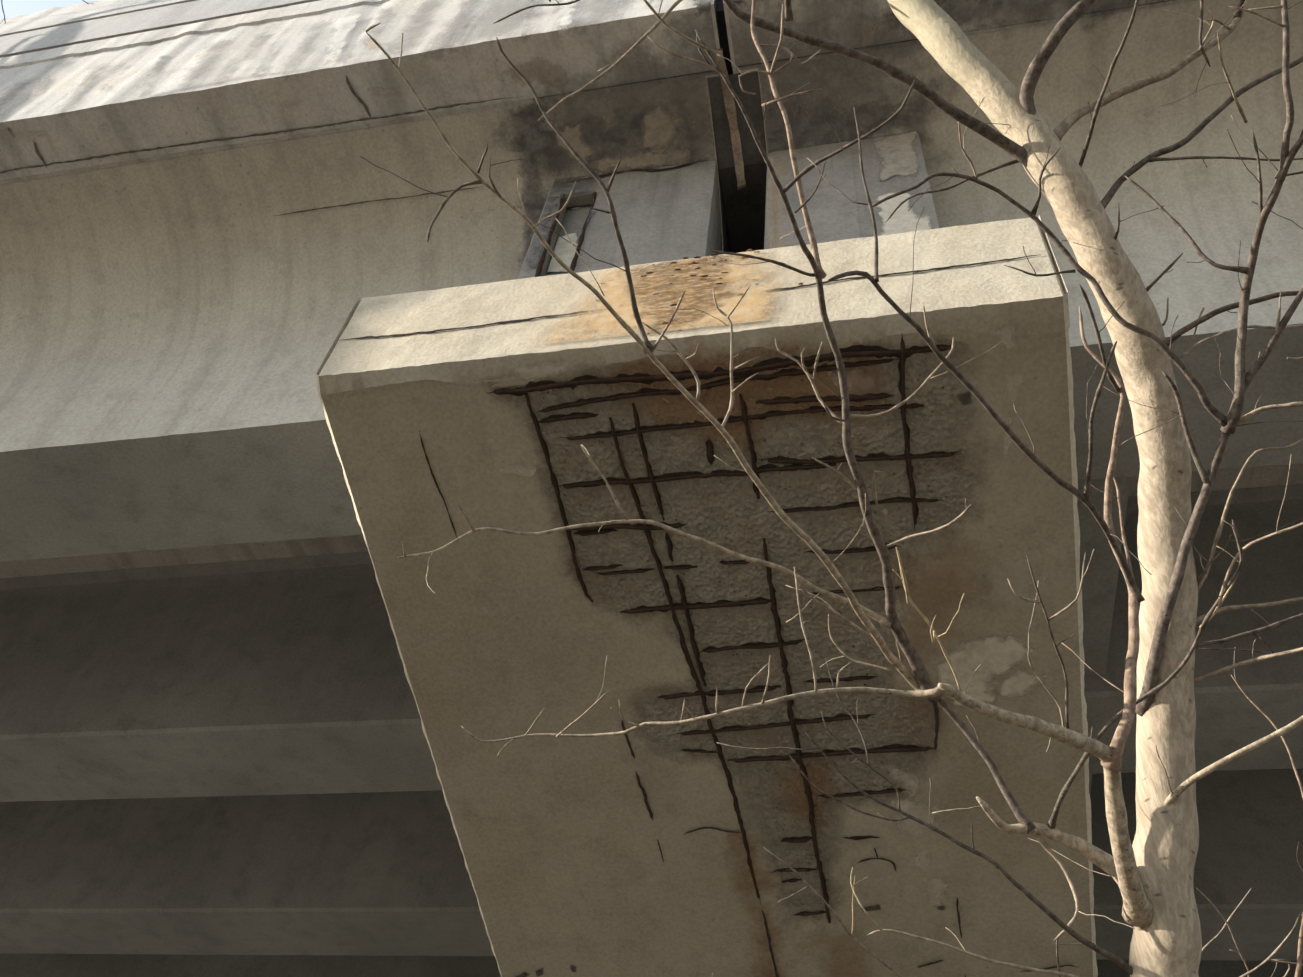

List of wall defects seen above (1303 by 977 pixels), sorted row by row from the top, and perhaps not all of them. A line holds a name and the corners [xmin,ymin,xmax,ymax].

crack [0,75,524,173]
crack [275,186,485,216]
damp [512,105,693,267]
peeling [875,131,931,235]
crack [342,283,604,340]
corrosion [548,252,773,343]
crack [766,254,1041,292]
crack [419,431,458,542]
spalling [488,336,980,924]